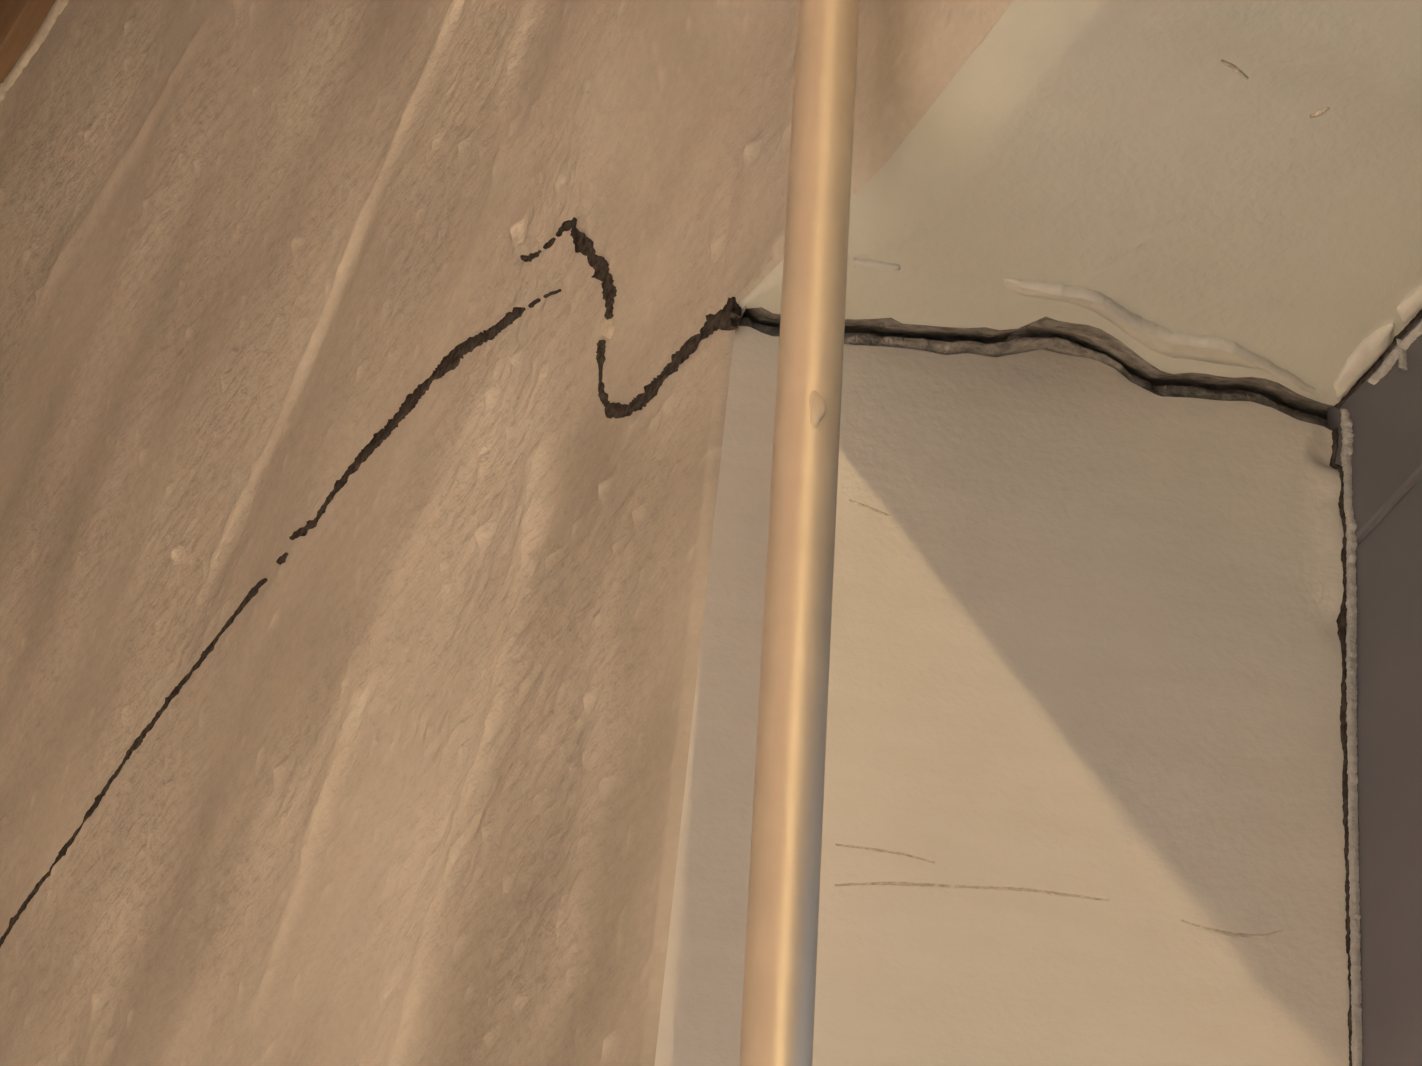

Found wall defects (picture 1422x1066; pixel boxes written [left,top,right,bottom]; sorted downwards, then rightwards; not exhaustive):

crack [0,217,781,947]
crack [835,309,1422,1066]
peeling [1333,285,1422,399]